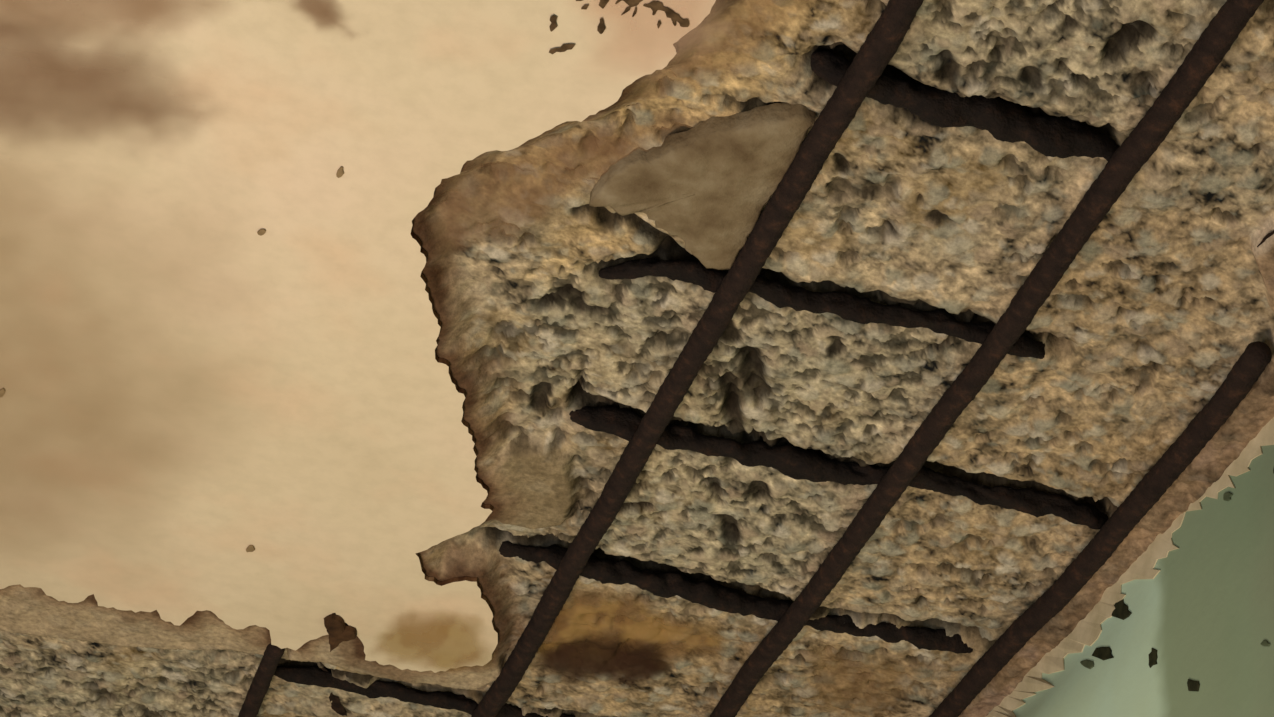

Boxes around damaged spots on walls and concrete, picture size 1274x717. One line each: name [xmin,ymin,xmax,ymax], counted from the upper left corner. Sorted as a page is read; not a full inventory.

damp [0,47,156,117]
crack [1257,230,1274,247]
spalling [256,0,889,717]
spalling [667,292,982,469]
spalling [735,0,1274,717]
spalling [0,584,271,717]
corrosion [385,621,477,667]
corrosion [540,596,718,682]